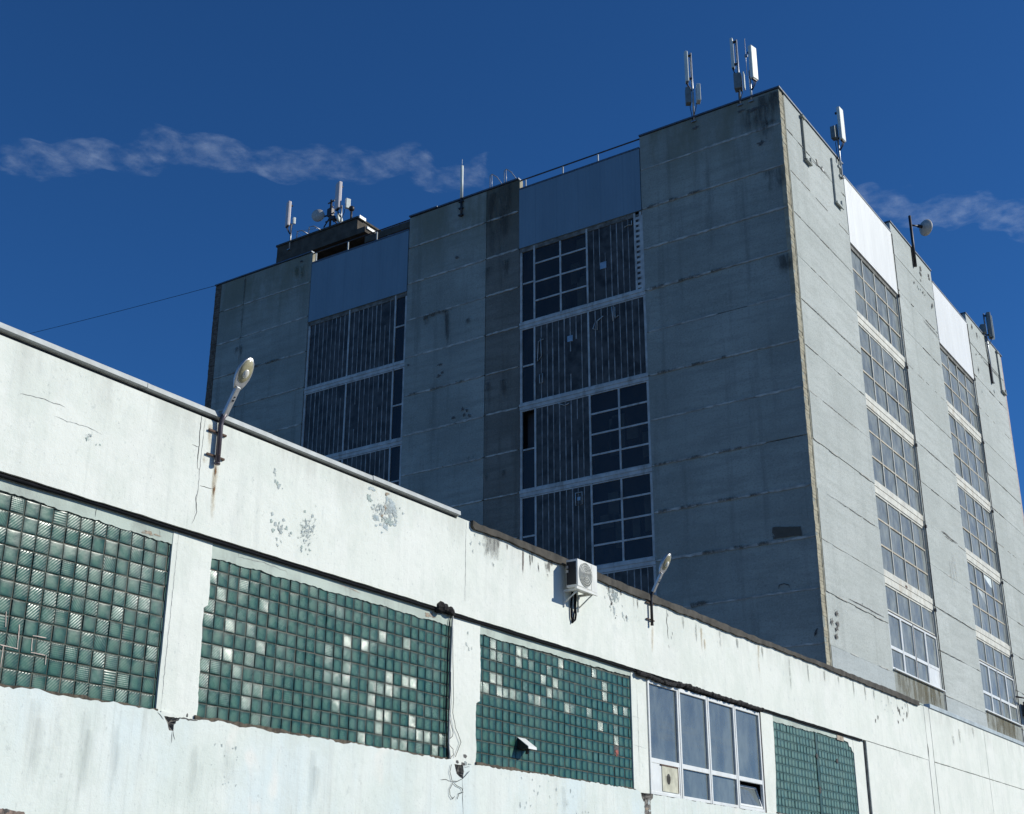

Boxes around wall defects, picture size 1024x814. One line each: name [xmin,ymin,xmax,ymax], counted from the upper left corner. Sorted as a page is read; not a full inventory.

peeling [270,506,317,555]
peeling [367,486,405,534]
crack [159,419,213,703]